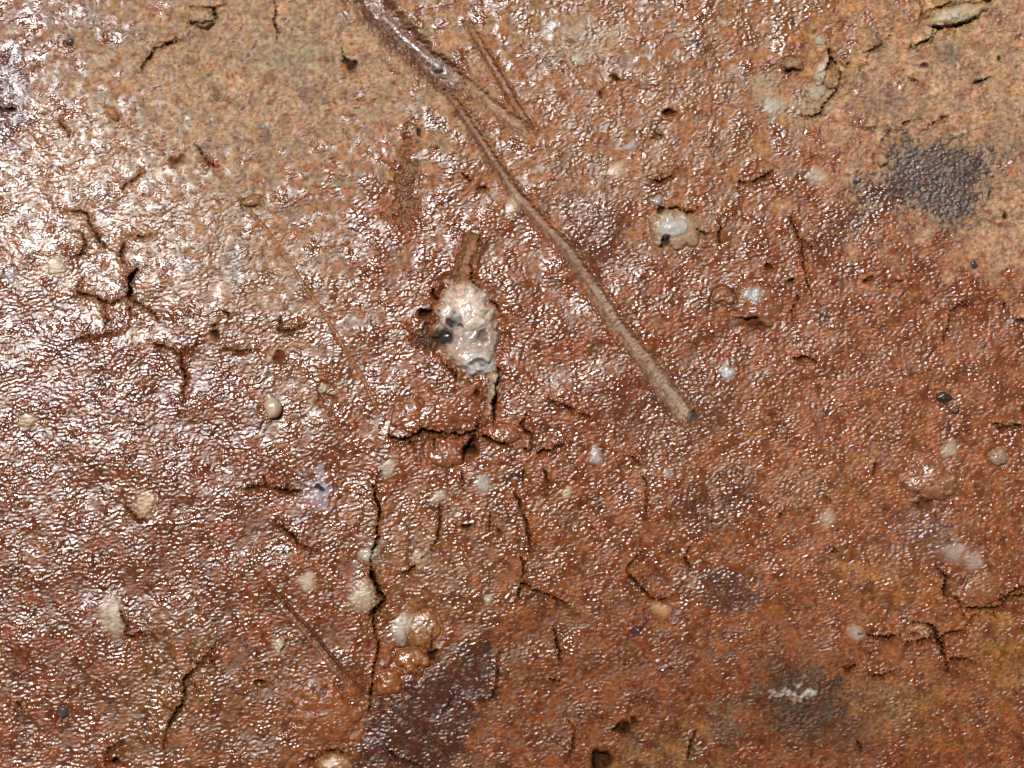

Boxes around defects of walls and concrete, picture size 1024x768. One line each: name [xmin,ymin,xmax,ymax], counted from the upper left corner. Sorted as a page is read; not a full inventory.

crack [63,208,252,407]
crack [387,366,593,492]
crack [243,472,302,494]
crack [627,454,649,514]
crack [272,520,319,552]
crack [365,470,442,714]
crack [488,491,570,683]
crack [626,546,693,602]
crack [858,564,1024,680]
crack [253,678,273,686]
crack [441,647,501,713]